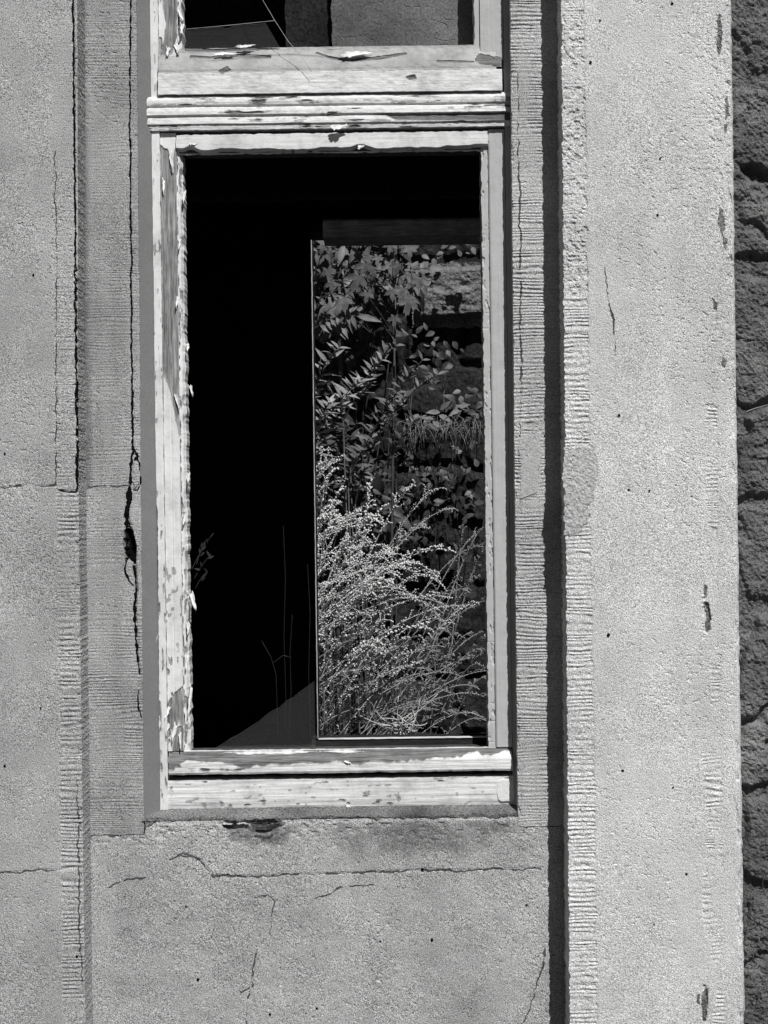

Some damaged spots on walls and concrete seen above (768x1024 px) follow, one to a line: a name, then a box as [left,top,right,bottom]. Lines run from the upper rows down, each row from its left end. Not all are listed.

peeling [314,50,409,63]
peeling [436,51,502,67]
peeling [153,93,510,130]
crack [0,0,142,717]
peeling [181,471,190,526]
peeling [156,547,512,799]
peeling [185,780,350,809]
peeling [362,778,401,805]
crack [169,853,542,1024]